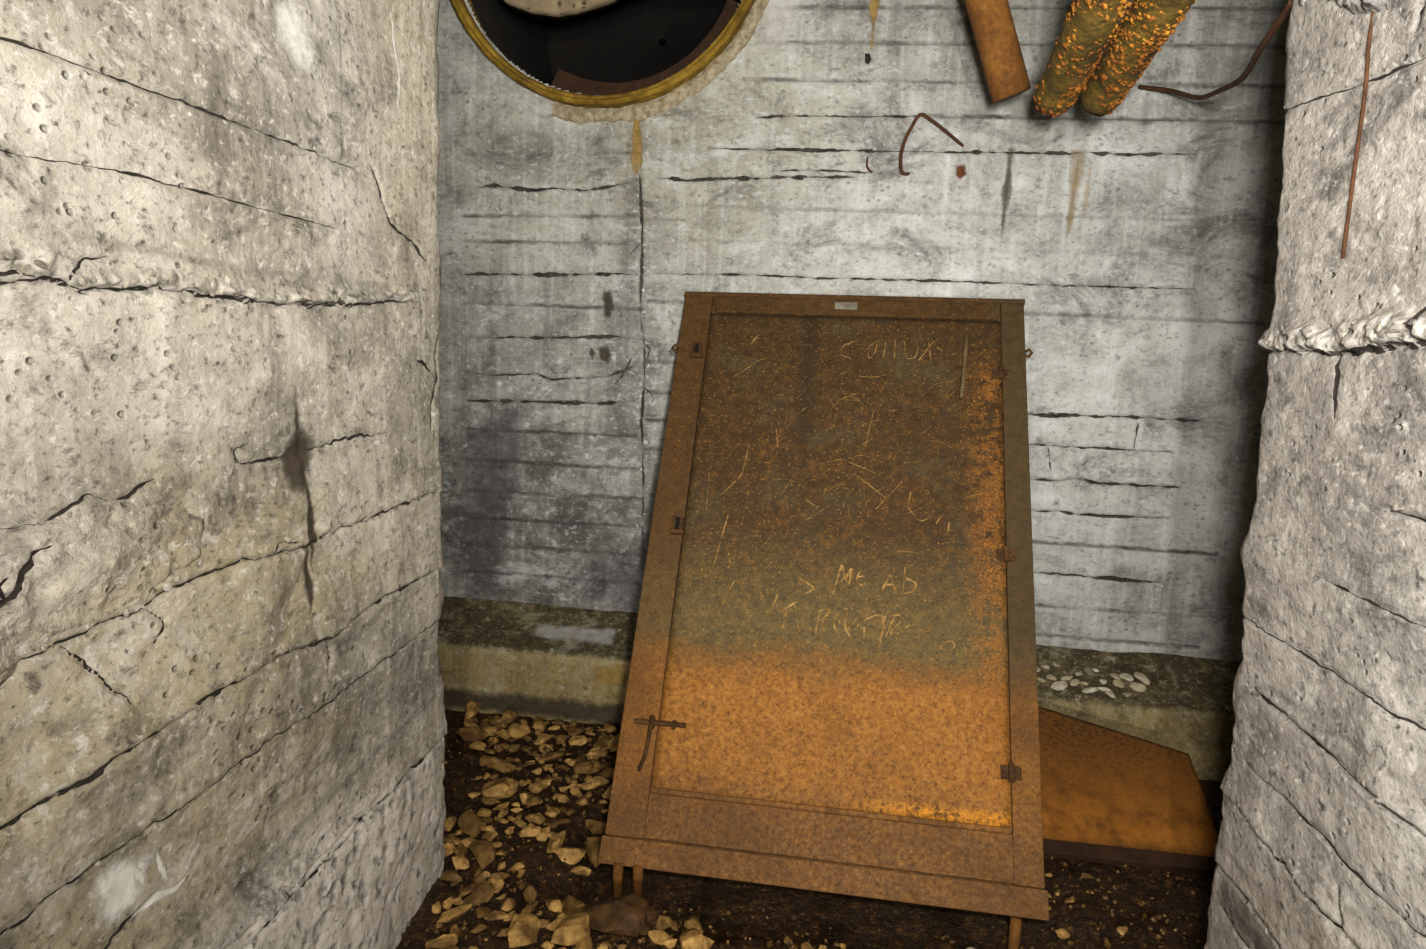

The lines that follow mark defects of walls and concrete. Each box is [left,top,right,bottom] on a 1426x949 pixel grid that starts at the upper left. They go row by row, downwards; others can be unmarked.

rust [870,0,878,21]
spalling [1300,0,1405,15]
crack [1284,58,1425,112]
crack [0,37,1200,543]
crack [1263,306,1426,419]
crack [1392,502,1426,522]
crack [20,492,436,705]
crack [1314,575,1425,627]
crack [1244,616,1426,731]
crack [0,568,439,949]
crack [1257,690,1414,826]
crack [1235,763,1426,949]